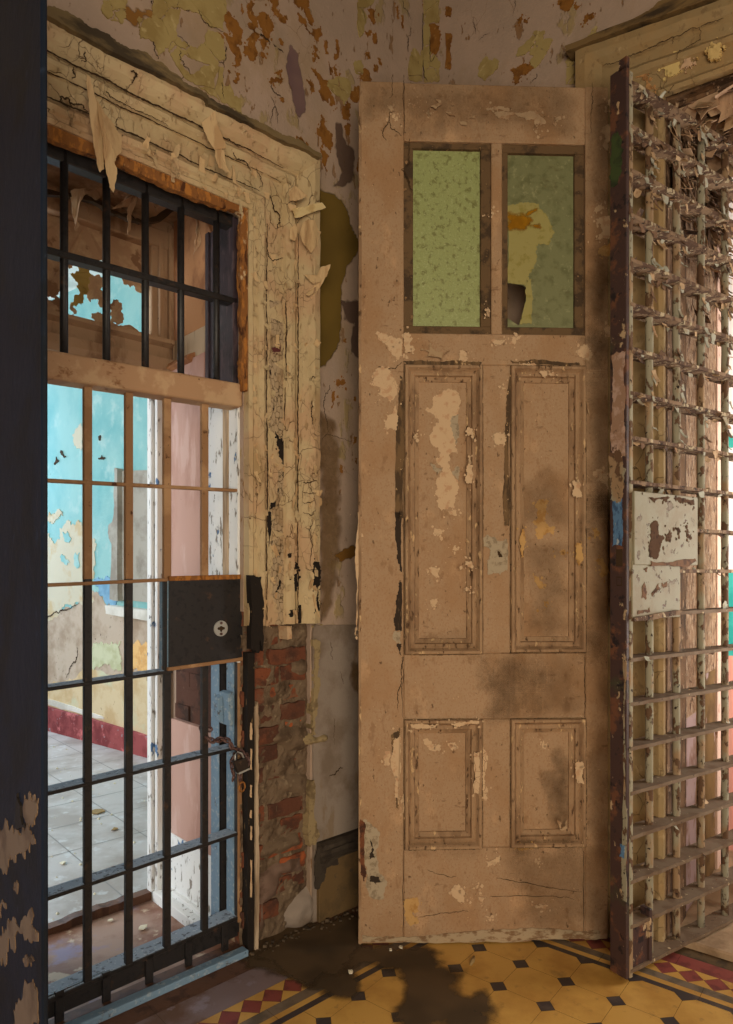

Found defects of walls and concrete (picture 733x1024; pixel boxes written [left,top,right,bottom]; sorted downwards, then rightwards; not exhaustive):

crack [151,1,227,97]
peeling [408,0,441,83]
peeling [101,0,267,240]
peeling [480,101,565,143]
peeling [47,73,141,332]
peeling [285,174,331,309]
crack [47,50,352,620]
flaking render [48,509,147,684]
flaking render [235,413,339,945]
peeling [0,791,39,894]
peeling [0,899,39,1024]